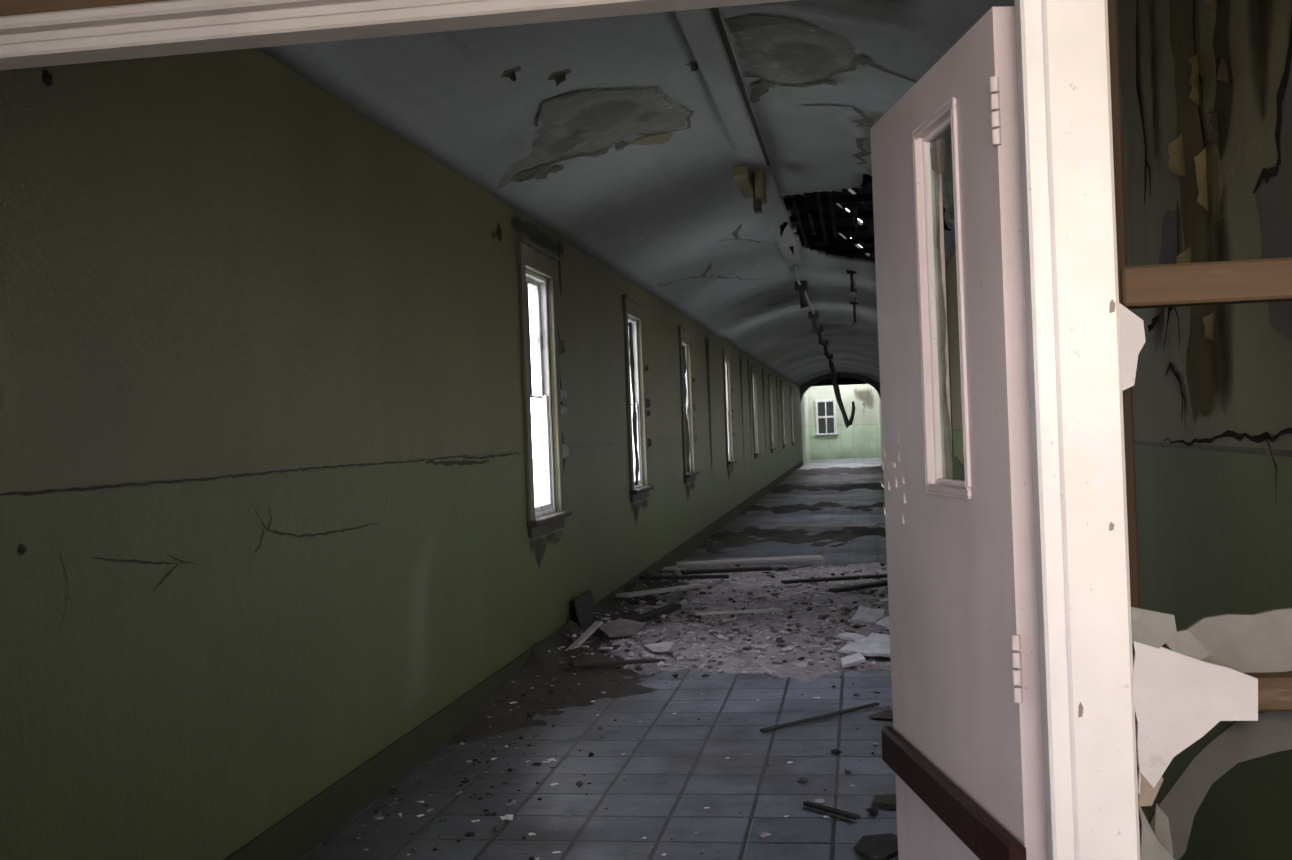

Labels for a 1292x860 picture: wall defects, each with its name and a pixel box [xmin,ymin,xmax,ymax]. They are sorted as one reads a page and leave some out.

peeling [725,14,917,103]
peeling [497,66,694,189]
crack [1136,0,1179,255]
crack [1163,307,1292,501]
crack [0,452,521,553]
crack [59,554,199,632]